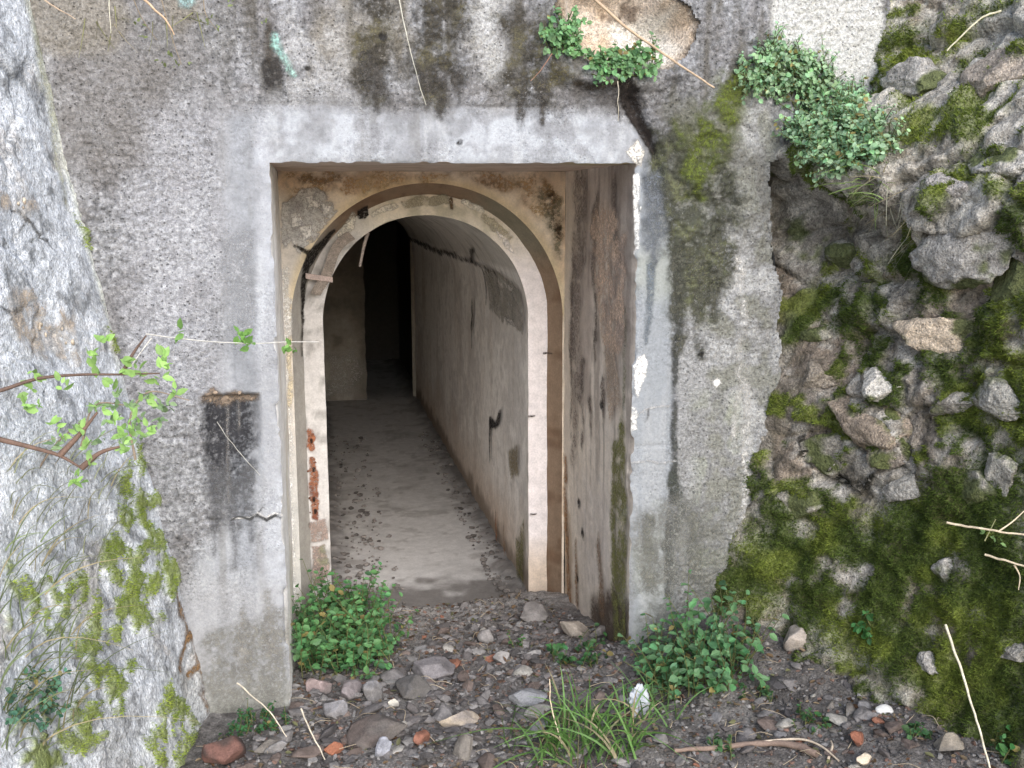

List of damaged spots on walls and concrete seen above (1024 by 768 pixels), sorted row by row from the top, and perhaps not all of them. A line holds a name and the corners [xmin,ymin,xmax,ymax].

water stain [349,0,396,111]
water stain [413,0,470,117]
water stain [499,10,574,125]
flaking render [281,187,337,254]
water stain [643,73,750,386]
water stain [204,398,256,547]
crack [231,507,281,522]
water stain [731,341,751,520]
water stain [591,542,628,642]